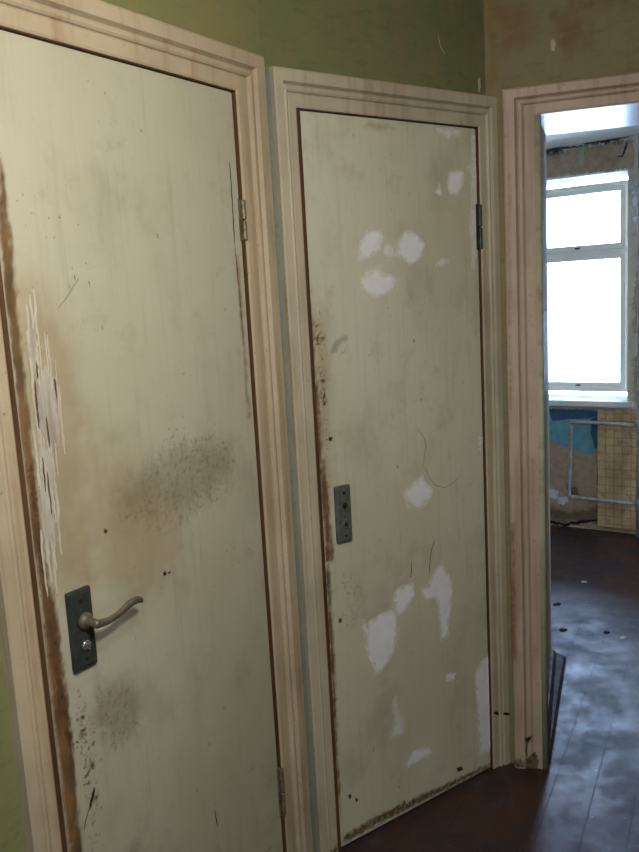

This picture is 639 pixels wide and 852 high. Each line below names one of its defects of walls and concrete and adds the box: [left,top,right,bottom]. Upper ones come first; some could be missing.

peeling [362,270,393,295]
peeling [360,232,424,263]
peeling [437,134,477,261]
flaking render [541,140,636,534]
peeling [26,288,66,597]
peeling [406,478,431,507]
peeling [367,566,452,672]
peeling [476,657,490,755]